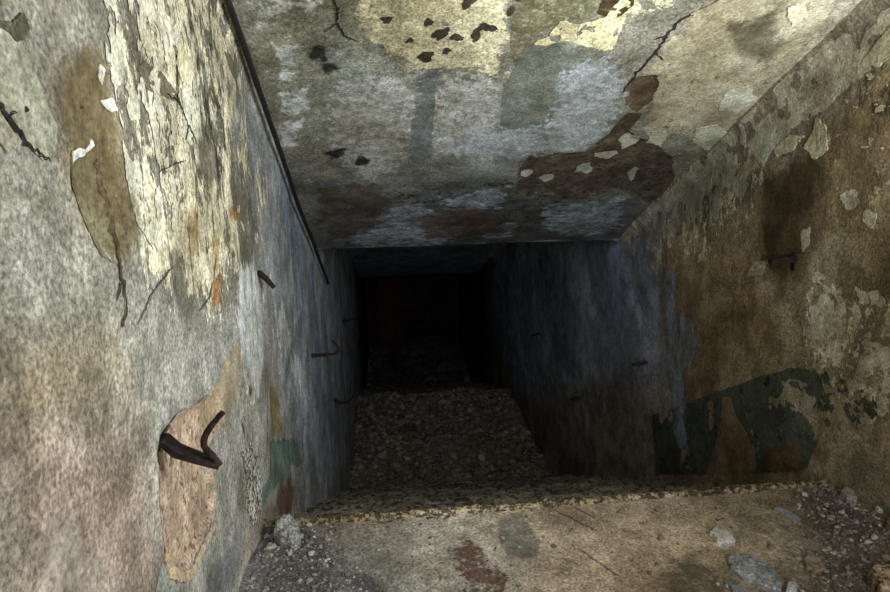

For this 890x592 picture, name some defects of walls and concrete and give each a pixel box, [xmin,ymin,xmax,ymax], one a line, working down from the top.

peeling [97,0,134,128]
spalling [137,61,179,102]
spalling [224,51,239,84]
peeling [417,18,498,63]
peeling [597,0,634,21]
crack [620,15,691,95]
crack [0,102,51,161]
spalling [514,75,675,203]
peeling [123,141,163,252]
spalling [156,393,223,592]